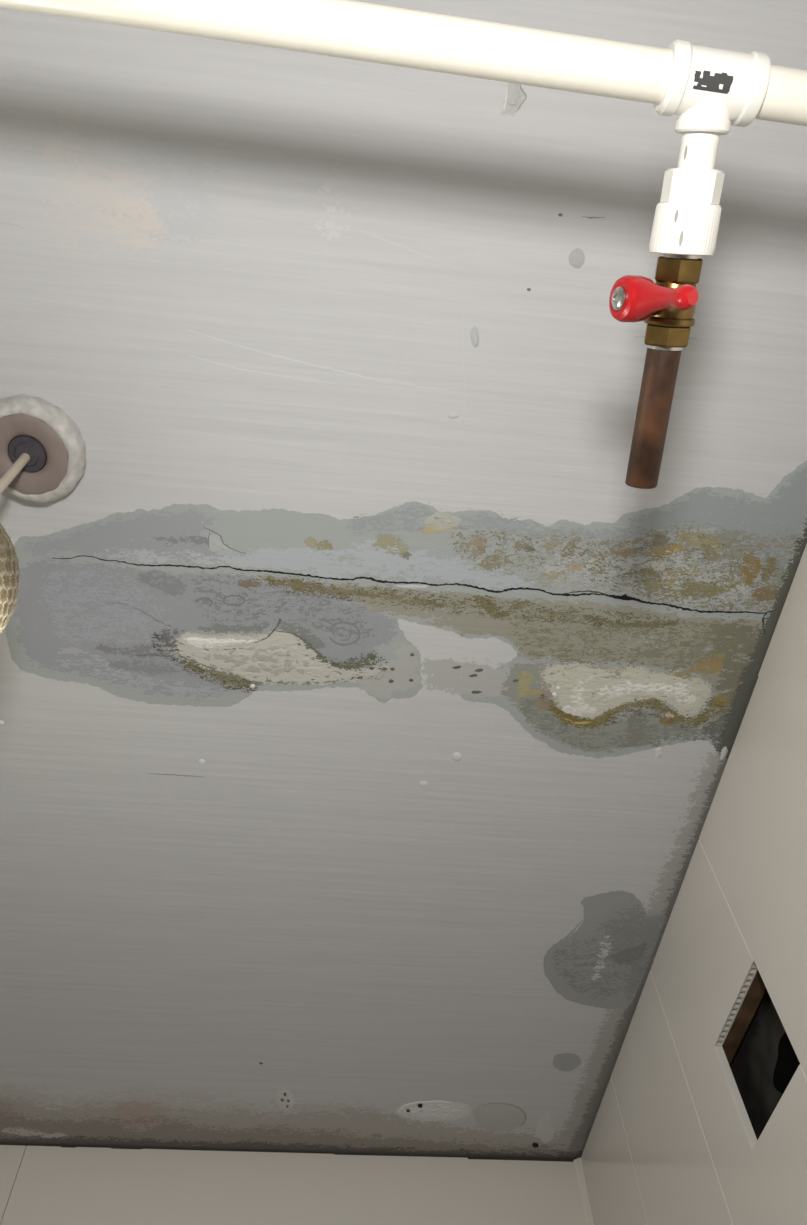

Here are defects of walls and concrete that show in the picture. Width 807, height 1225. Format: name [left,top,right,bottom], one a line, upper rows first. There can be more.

peeling [173,629,390,686]
leakage [0,460,807,760]
crack [52,527,776,634]
peeling [539,661,712,720]
leakage [543,890,669,1011]